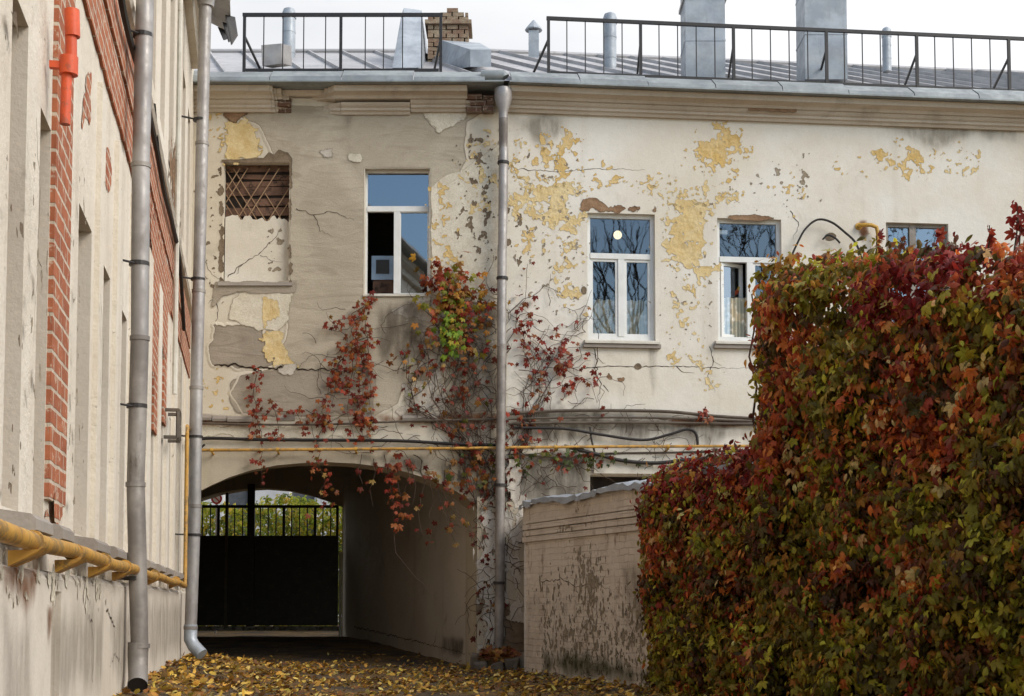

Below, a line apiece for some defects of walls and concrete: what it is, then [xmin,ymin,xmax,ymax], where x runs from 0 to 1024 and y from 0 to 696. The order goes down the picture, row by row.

flaking render [82,72,92,129]
peeling [833,137,981,181]
crack [206,230,279,322]
flaking render [202,102,822,442]
crack [214,363,345,373]
crack [581,346,739,401]
peeling [445,453,653,686]